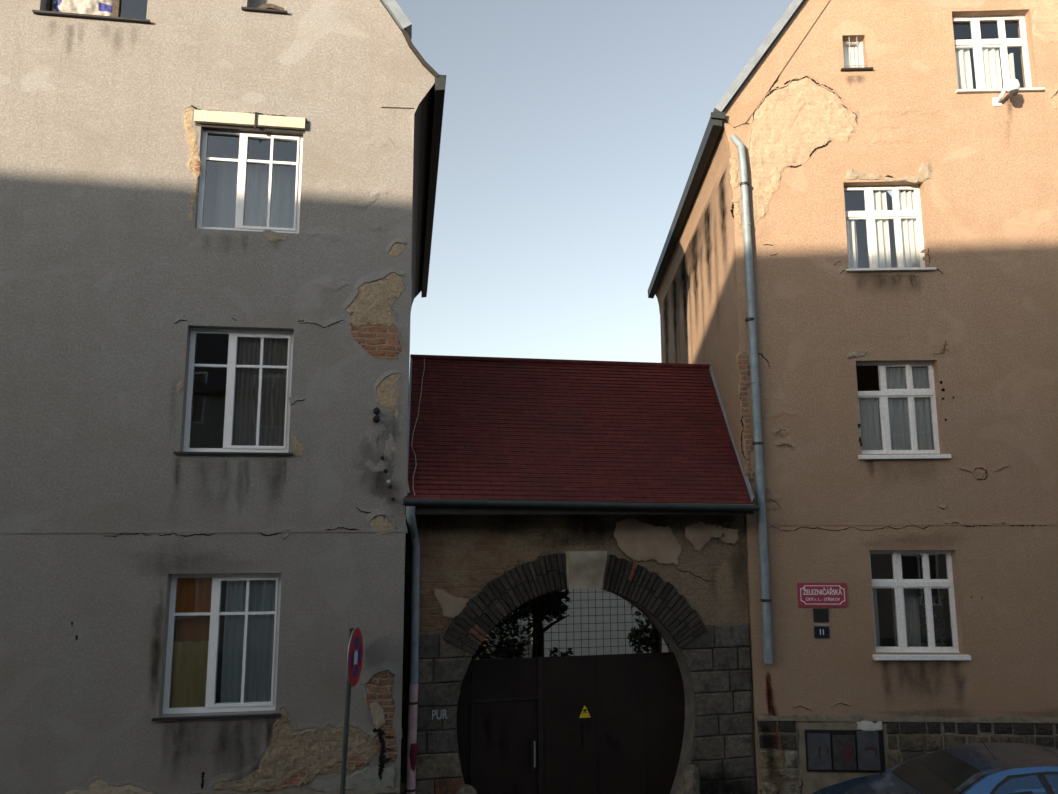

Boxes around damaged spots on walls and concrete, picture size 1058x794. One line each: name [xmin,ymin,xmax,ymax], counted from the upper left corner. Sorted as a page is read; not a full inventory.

peeling [1029,0,1058,44]
peeling [1048,84,1058,115]
flaking render [182,106,201,224]
peeling [729,73,860,227]
peeling [342,237,408,419]
crack [104,527,216,537]
crack [254,522,369,536]
peeling [614,519,739,565]
crack [767,497,1058,531]
rust [766,674,776,716]
peeling [209,661,402,793]